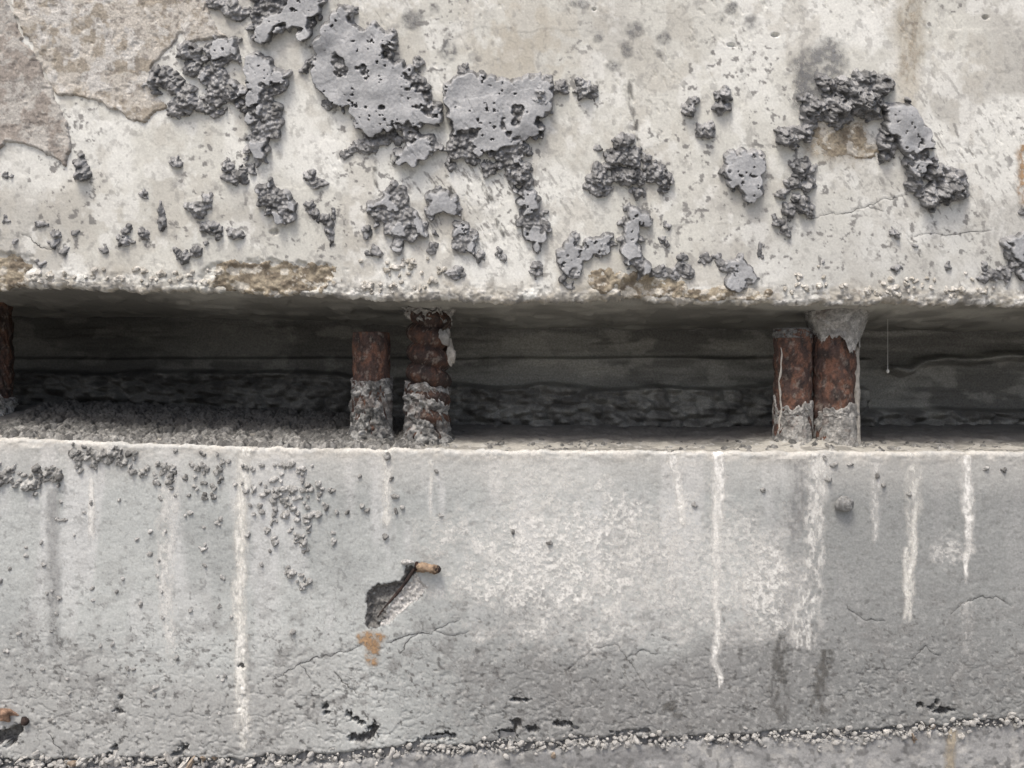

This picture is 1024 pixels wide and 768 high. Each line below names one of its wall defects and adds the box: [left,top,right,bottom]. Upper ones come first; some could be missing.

peeling [0,0,227,168]
spalling [207,259,342,297]
peeling [299,4,444,168]
peeling [361,180,507,281]
peeling [555,132,773,302]
peeling [771,68,970,239]
rust [357,632,385,665]
spalling [365,565,429,628]
crack [390,621,467,653]
damp [435,451,832,718]
efflorescence [904,453,919,619]
efflorescence [935,455,974,576]